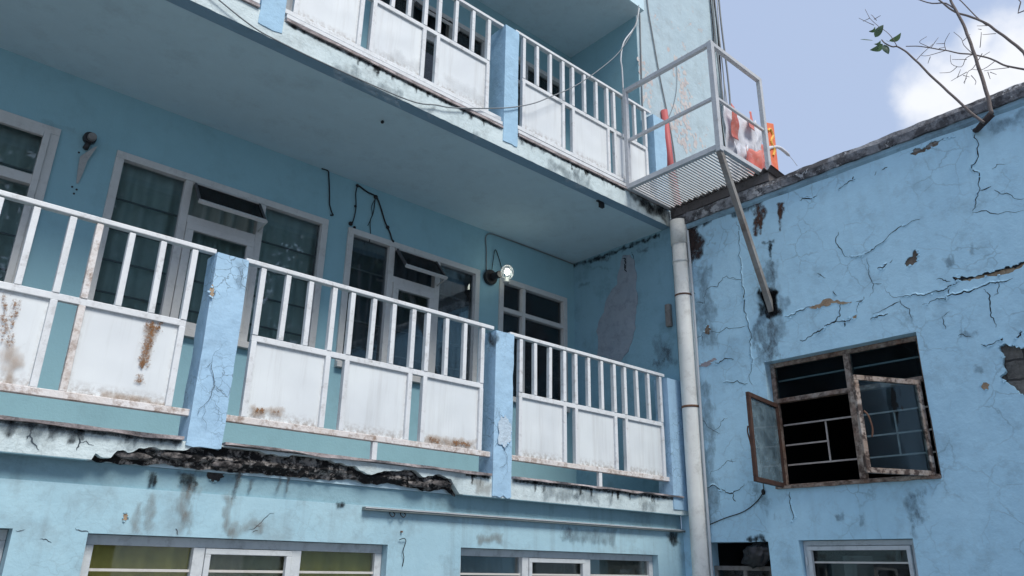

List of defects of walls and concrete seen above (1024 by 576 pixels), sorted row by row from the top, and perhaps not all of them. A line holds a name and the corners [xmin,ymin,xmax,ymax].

damp [520,138,666,222]
crack [969,127,1023,214]
corrosion [753,203,784,236]
corrosion [1,294,20,343]
crack [694,224,754,386]
damp [757,288,781,319]
crack [784,219,1024,348]
spalling [905,249,920,267]
corrosion [136,321,163,384]
spalling [979,337,1024,396]
spalling [92,447,455,496]
damp [515,480,673,500]